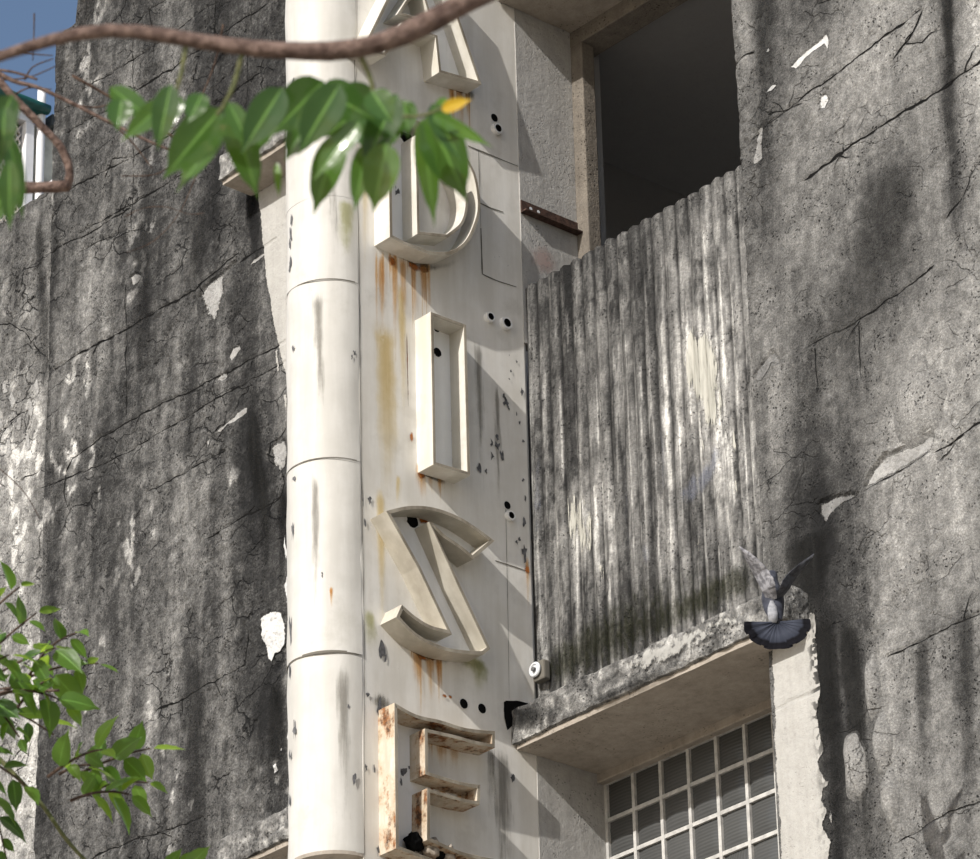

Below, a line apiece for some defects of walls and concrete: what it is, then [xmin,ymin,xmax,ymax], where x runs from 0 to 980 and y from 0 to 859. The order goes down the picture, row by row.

spalling [792,35,829,68]
crack [747,10,941,146]
crack [805,46,980,180]
spalling [202,272,225,319]
crack [809,265,934,395]
crack [0,247,282,511]
spalling [868,437,934,485]
crack [864,422,980,491]
peeling [261,577,292,661]
leakage [597,613,736,701]
crack [888,591,979,657]